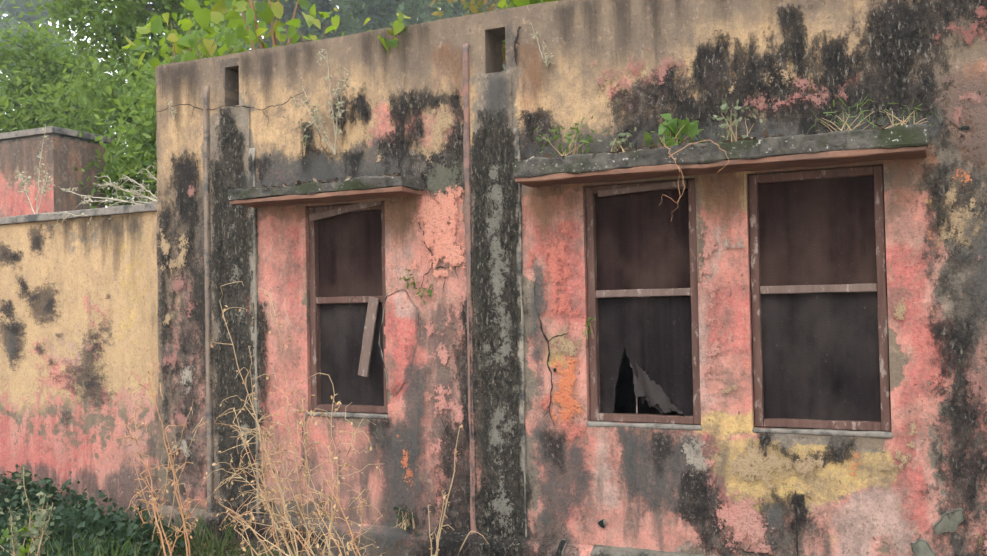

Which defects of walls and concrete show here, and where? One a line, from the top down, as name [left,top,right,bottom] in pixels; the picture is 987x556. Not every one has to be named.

crack [158,91,305,130]
leakage [0,277,61,371]
leakage [0,221,86,264]
leakage [53,324,111,406]
leakage [156,82,465,549]
crack [534,281,569,426]
leakage [368,0,987,556]
peeling [679,429,824,556]